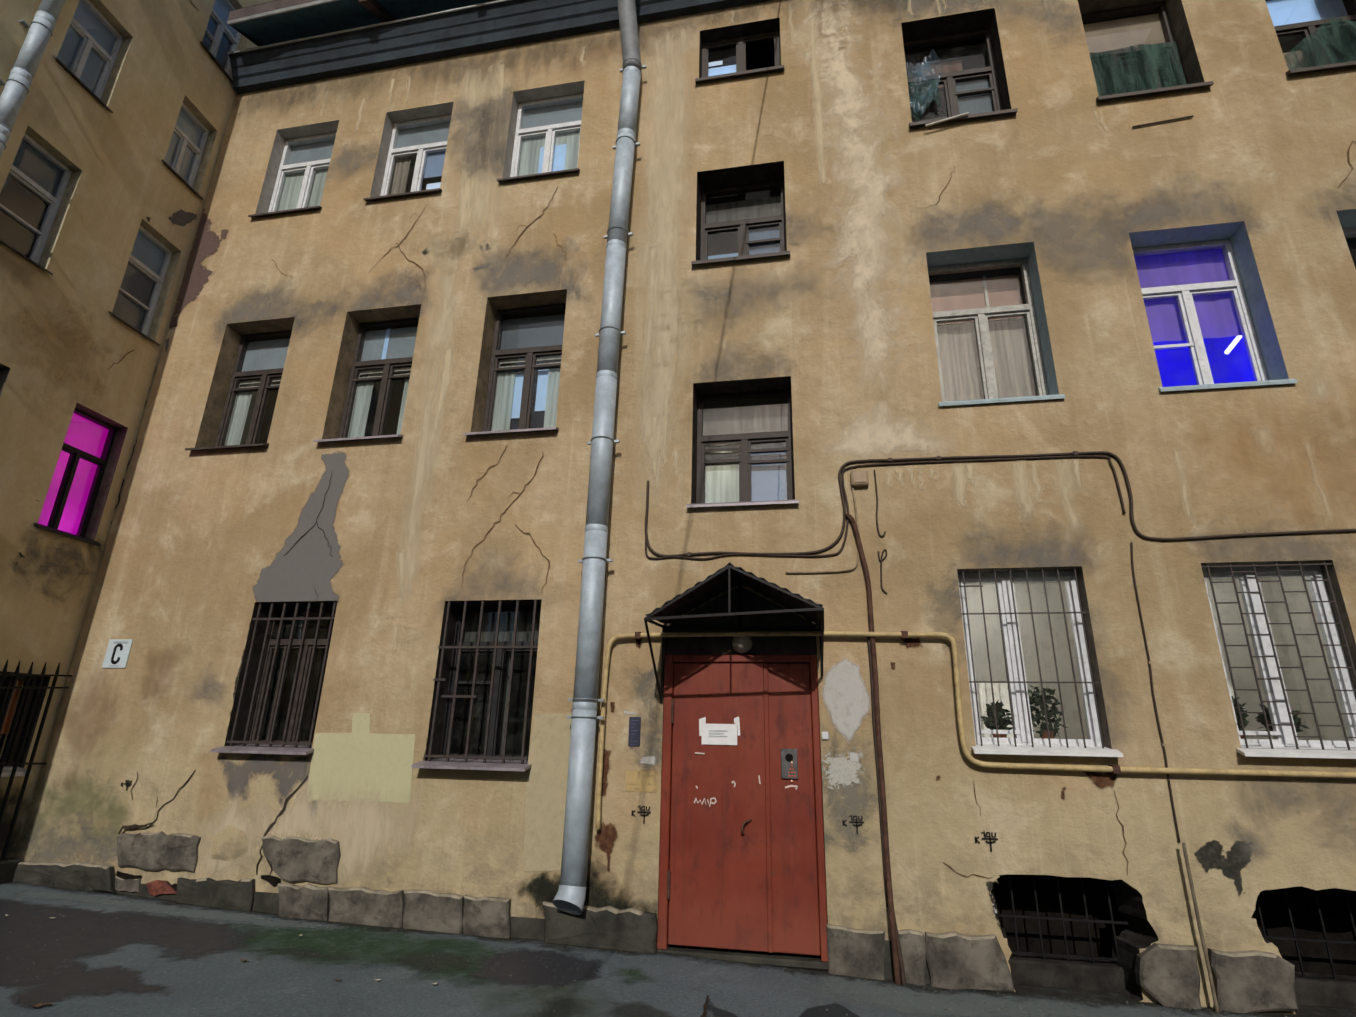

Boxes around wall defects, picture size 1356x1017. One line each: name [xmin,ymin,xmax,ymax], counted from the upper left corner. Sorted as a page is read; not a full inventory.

crack [1338,141,1356,188]
crack [369,205,426,291]
crack [504,186,567,259]
peeling [165,209,228,353]
crack [462,445,550,593]
crack [118,771,195,835]
crack [256,776,308,887]
crack [115,871,177,891]
leakage [521,874,560,915]
leakage [584,865,648,912]
flaking render [986,881,1001,928]